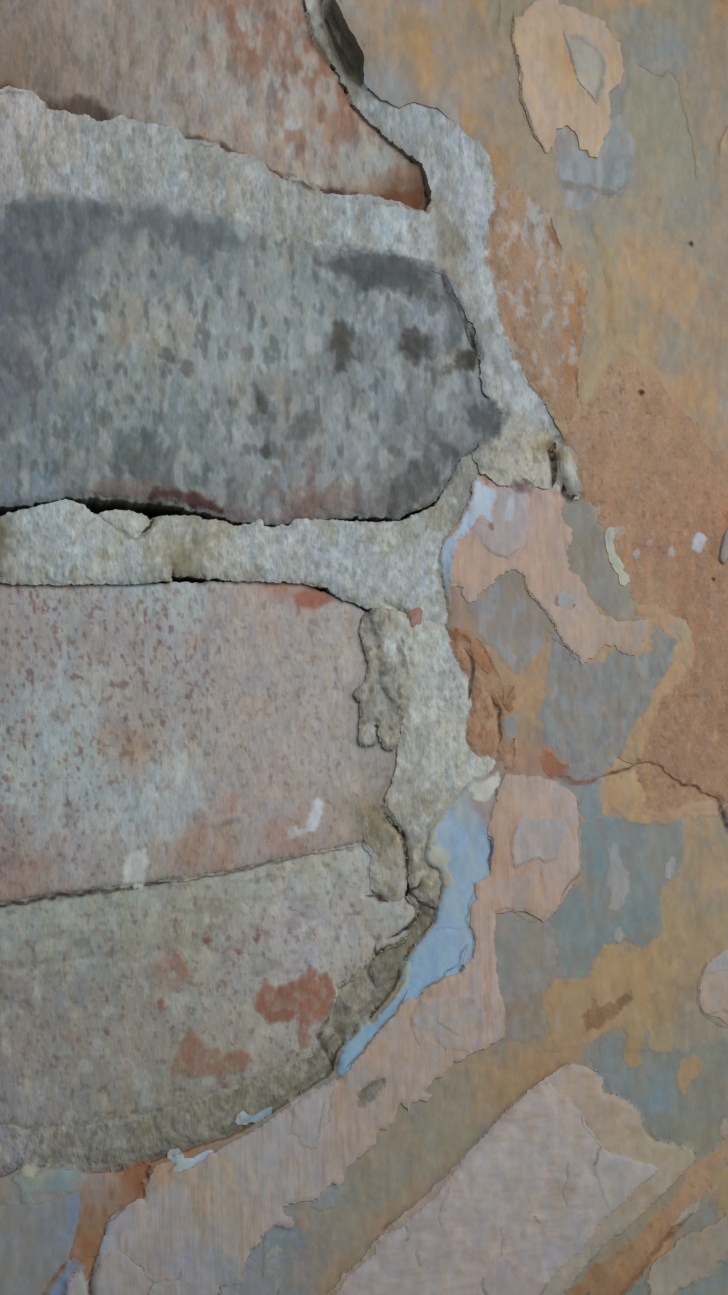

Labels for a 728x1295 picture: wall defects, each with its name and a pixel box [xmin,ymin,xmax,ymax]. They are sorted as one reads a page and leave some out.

peeling [510,0,636,212]
spalling [437,184,728,826]
crack [0,845,359,908]
crack [560,757,728,834]
peeling [0,769,728,1295]